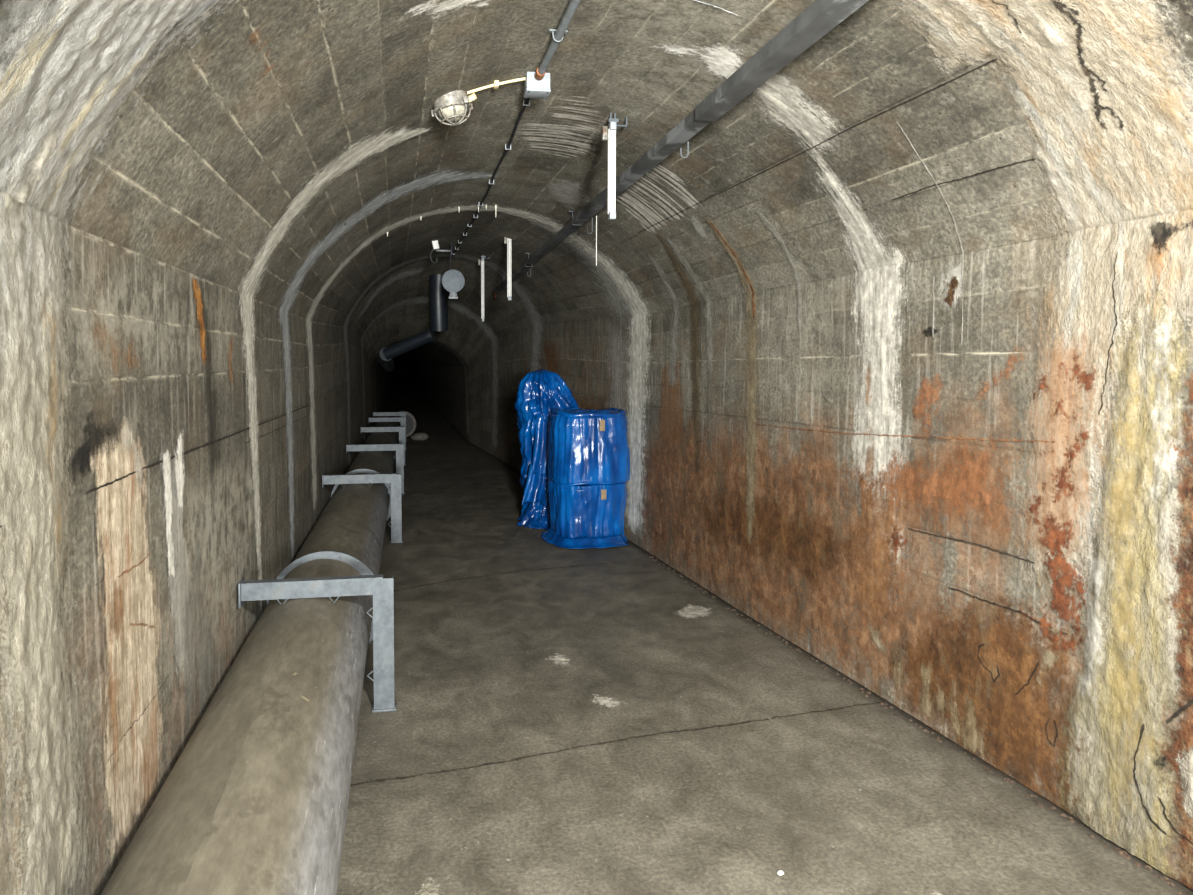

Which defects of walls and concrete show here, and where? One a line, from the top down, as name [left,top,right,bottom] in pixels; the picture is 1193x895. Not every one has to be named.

crack [992,0,1022,33]
crack [1052,0,1124,129]
corrosion [193,279,206,364]
corrosion [941,264,962,307]
water stain [882,0,1193,684]
water stain [0,0,239,895]
corrosion [642,354,1096,813]
crack [908,528,1035,564]
crack [949,587,1067,634]
corrosion [1161,374,1193,890]
crack [1133,699,1193,845]